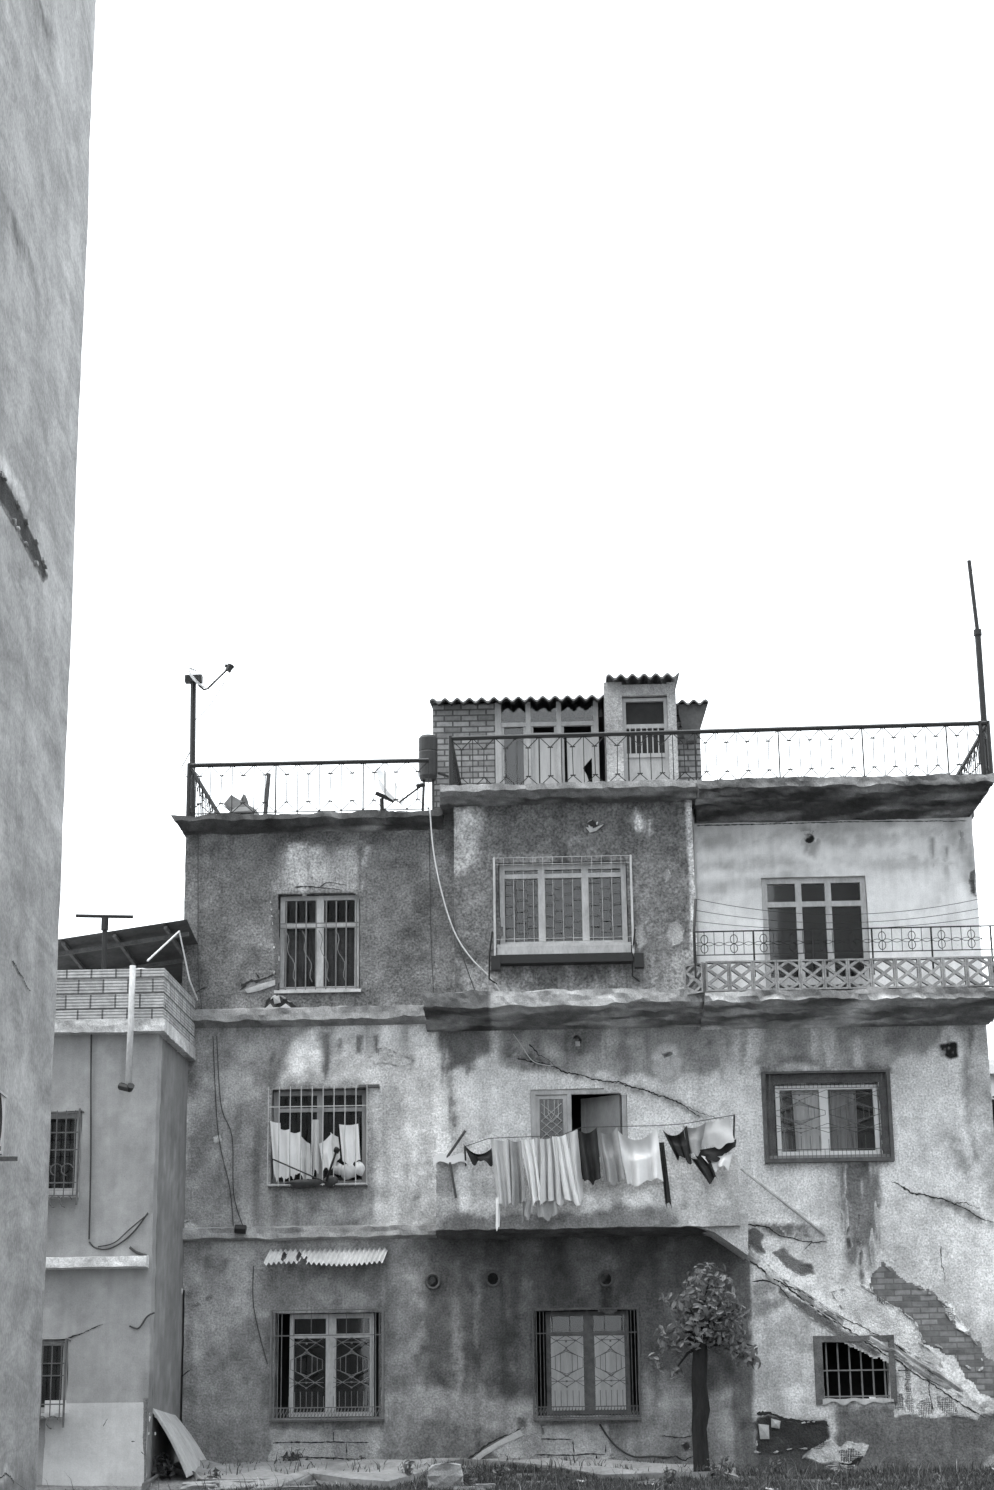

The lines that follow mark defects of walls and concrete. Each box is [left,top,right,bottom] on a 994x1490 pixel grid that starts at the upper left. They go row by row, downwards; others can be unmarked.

spalling [0,447,48,583]
damp [842,1212,869,1285]
crack [892,1182,992,1222]
peeling [748,1227,994,1420]